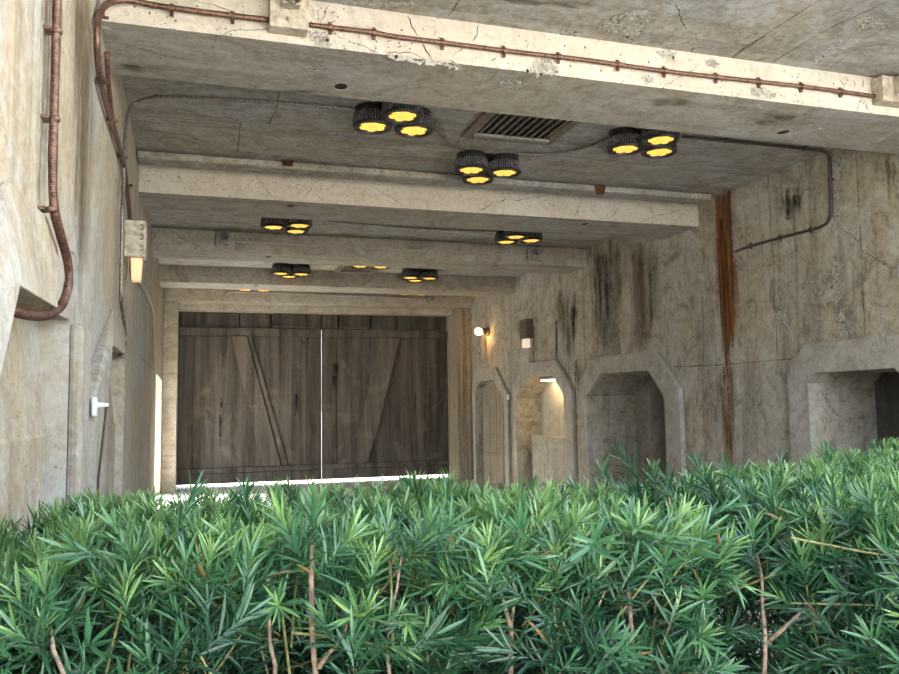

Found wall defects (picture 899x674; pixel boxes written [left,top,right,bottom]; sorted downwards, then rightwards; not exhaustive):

crack [194,0,268,35]
crack [309,4,484,83]
damp [594,244,620,350]
rust [716,190,739,463]